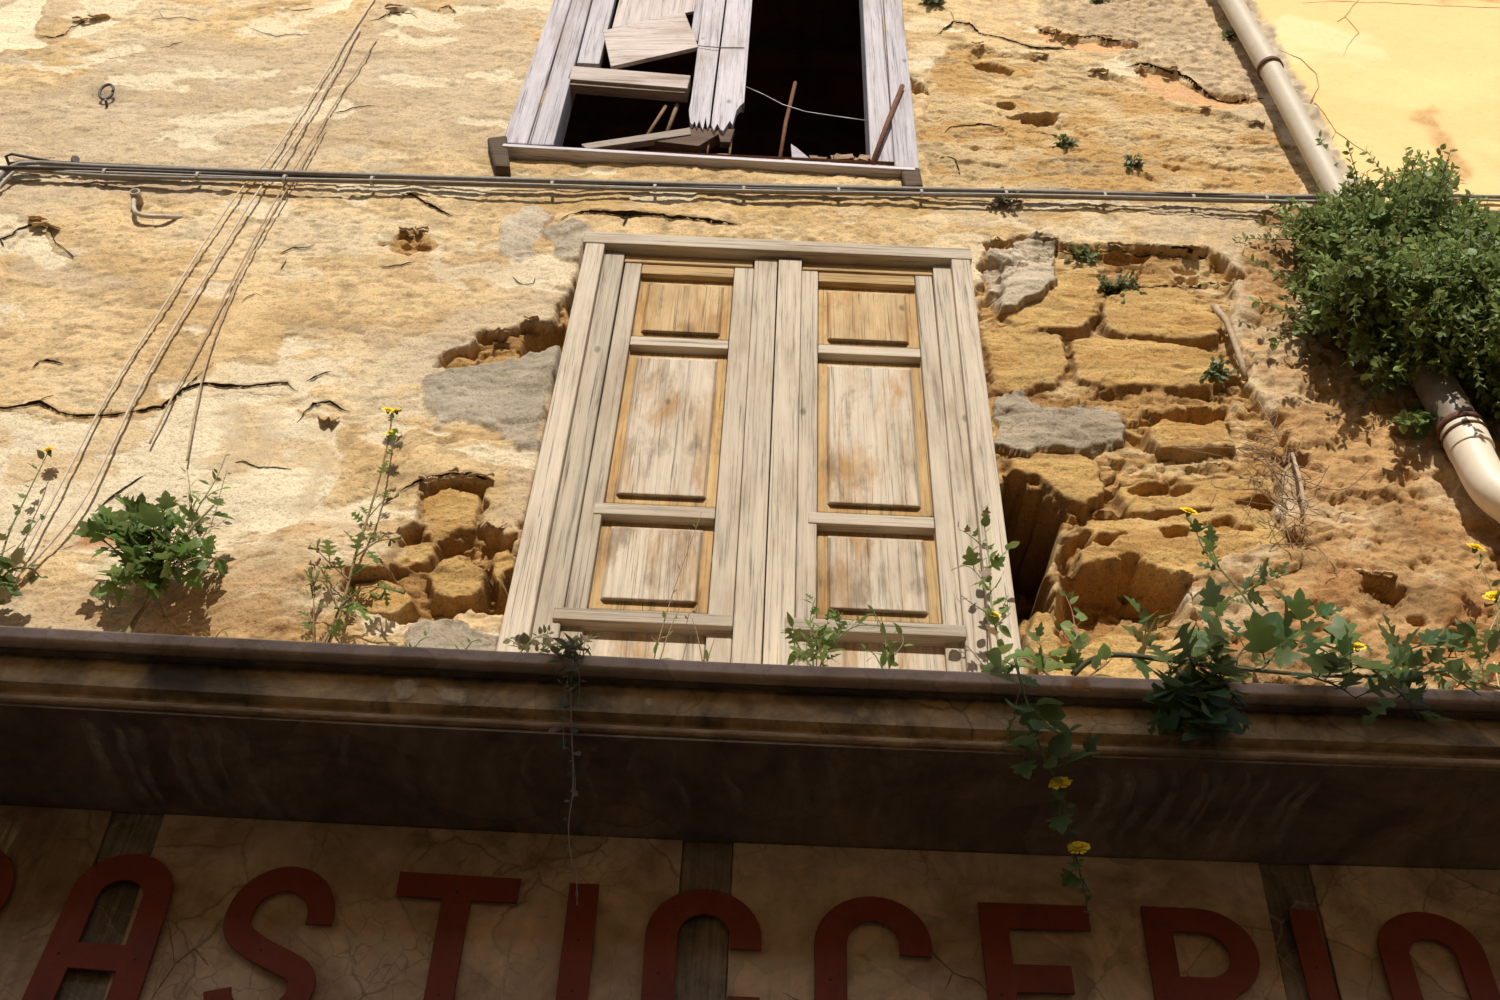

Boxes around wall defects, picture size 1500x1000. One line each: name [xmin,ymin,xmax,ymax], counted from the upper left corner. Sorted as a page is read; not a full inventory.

crack [936,12,1264,103]
crack [0,224,74,257]
flaking render [382,225,436,256]
crack [560,210,742,225]
flaking render [437,296,571,369]
crack [0,359,349,420]
flaking render [975,234,1313,676]
flaking render [349,466,522,625]
flaking render [1354,568,1407,611]